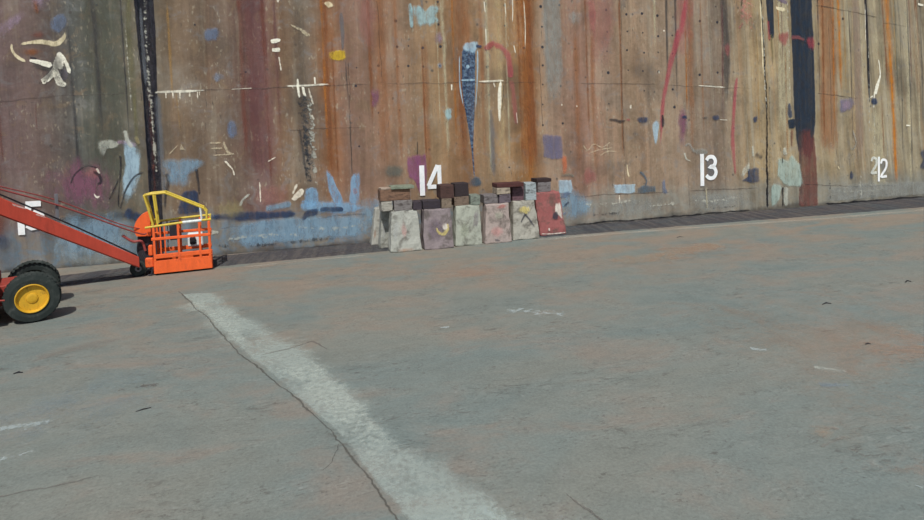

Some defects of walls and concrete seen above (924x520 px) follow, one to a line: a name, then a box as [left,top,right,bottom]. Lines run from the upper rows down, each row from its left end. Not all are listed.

corrosion [517,0,536,163]
corrosion [885,0,897,175]